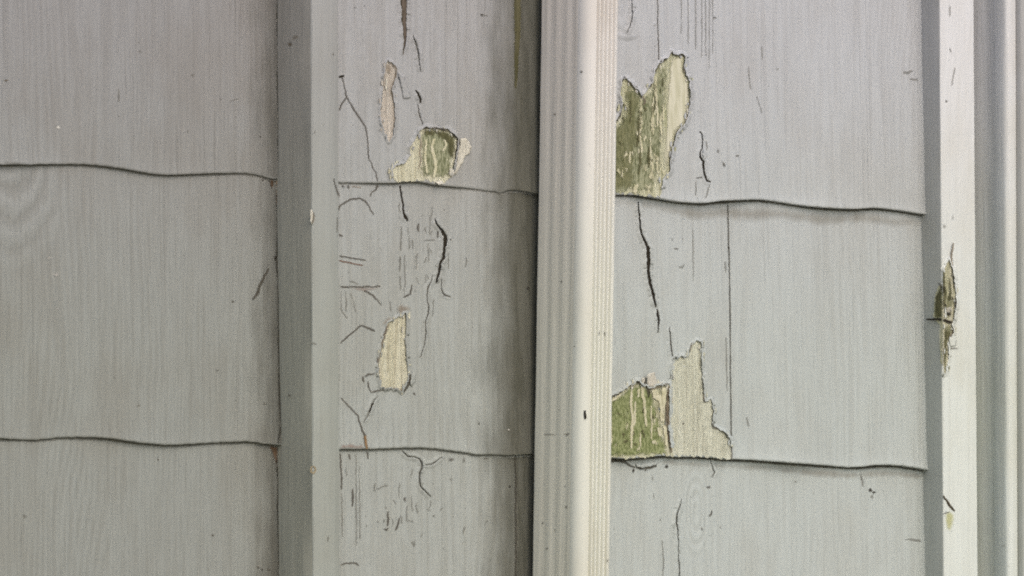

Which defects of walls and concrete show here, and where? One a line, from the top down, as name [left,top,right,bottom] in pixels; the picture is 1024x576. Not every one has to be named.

crack [334,75,452,359]
peeling [378,57,411,145]
peeling [388,123,471,185]
peeling [615,48,695,198]
peeling [361,310,416,424]
crack [633,201,686,379]
peeling [611,337,734,472]
peeling [941,255,960,379]